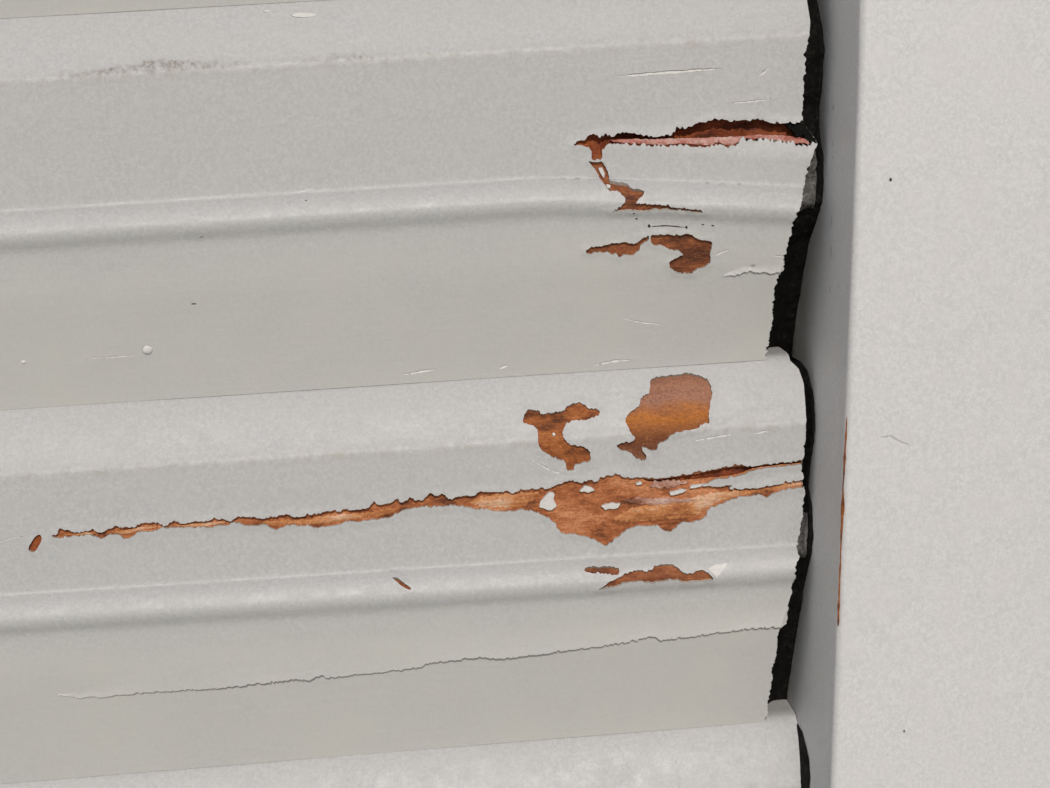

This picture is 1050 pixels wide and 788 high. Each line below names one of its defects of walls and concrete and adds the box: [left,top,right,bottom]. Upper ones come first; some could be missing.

peeling [586,234,712,273]
peeling [523,403,599,470]
peeling [617,374,712,461]
peeling [29,535,42,551]
peeling [585,563,727,588]